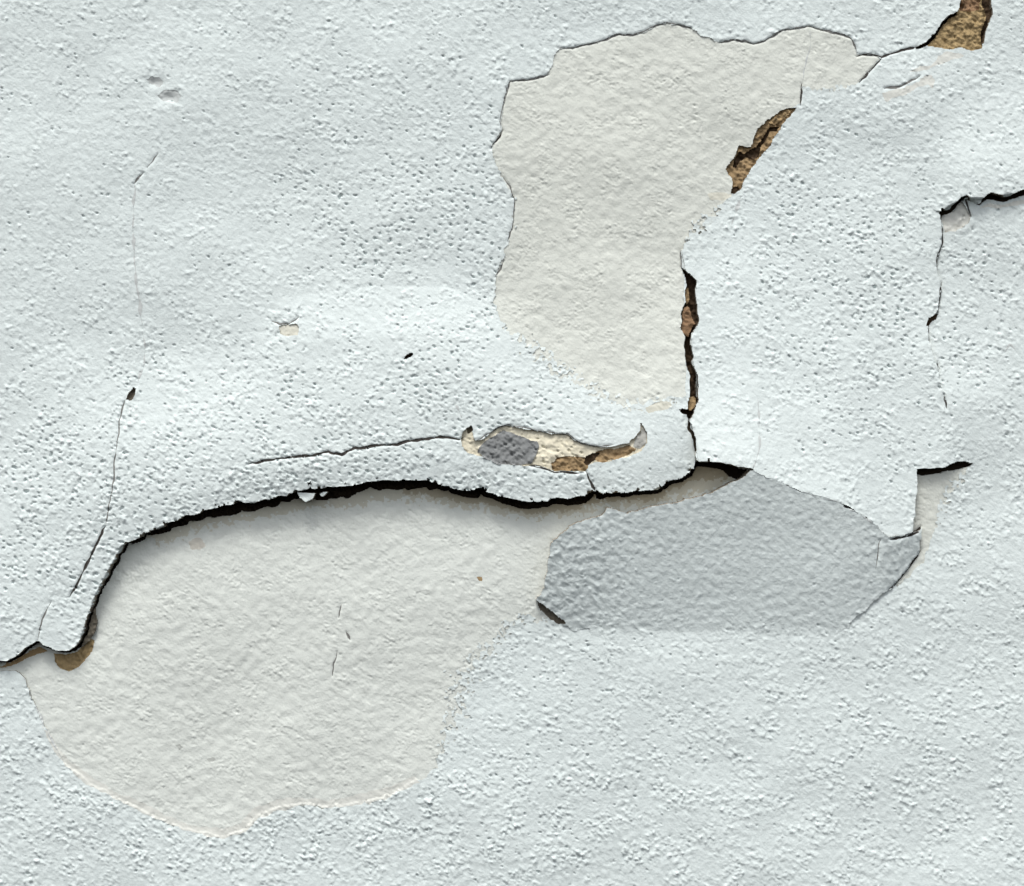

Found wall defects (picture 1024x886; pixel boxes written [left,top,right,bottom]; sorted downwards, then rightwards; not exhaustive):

spalling [926,0,989,51]
peeling [0,467,750,829]
crack [0,154,761,758]
peeling [461,23,880,472]
crack [917,461,971,476]
crack [928,191,1024,372]